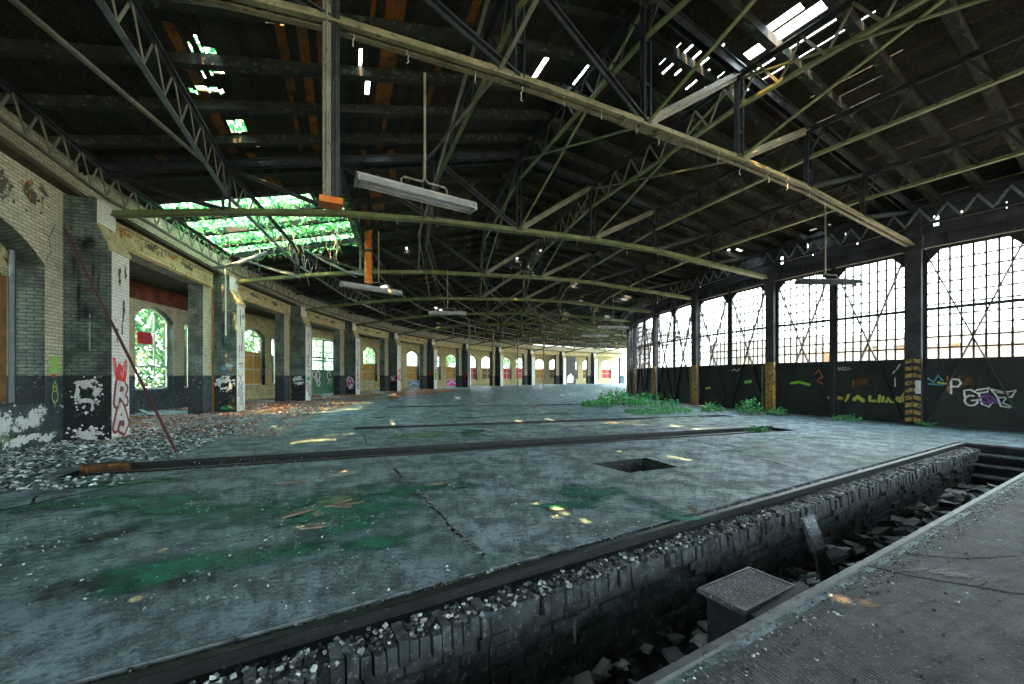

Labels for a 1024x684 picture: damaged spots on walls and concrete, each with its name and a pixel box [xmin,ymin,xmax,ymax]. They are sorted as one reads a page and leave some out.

peeling [0,376,109,450]
crack [239,460,485,556]